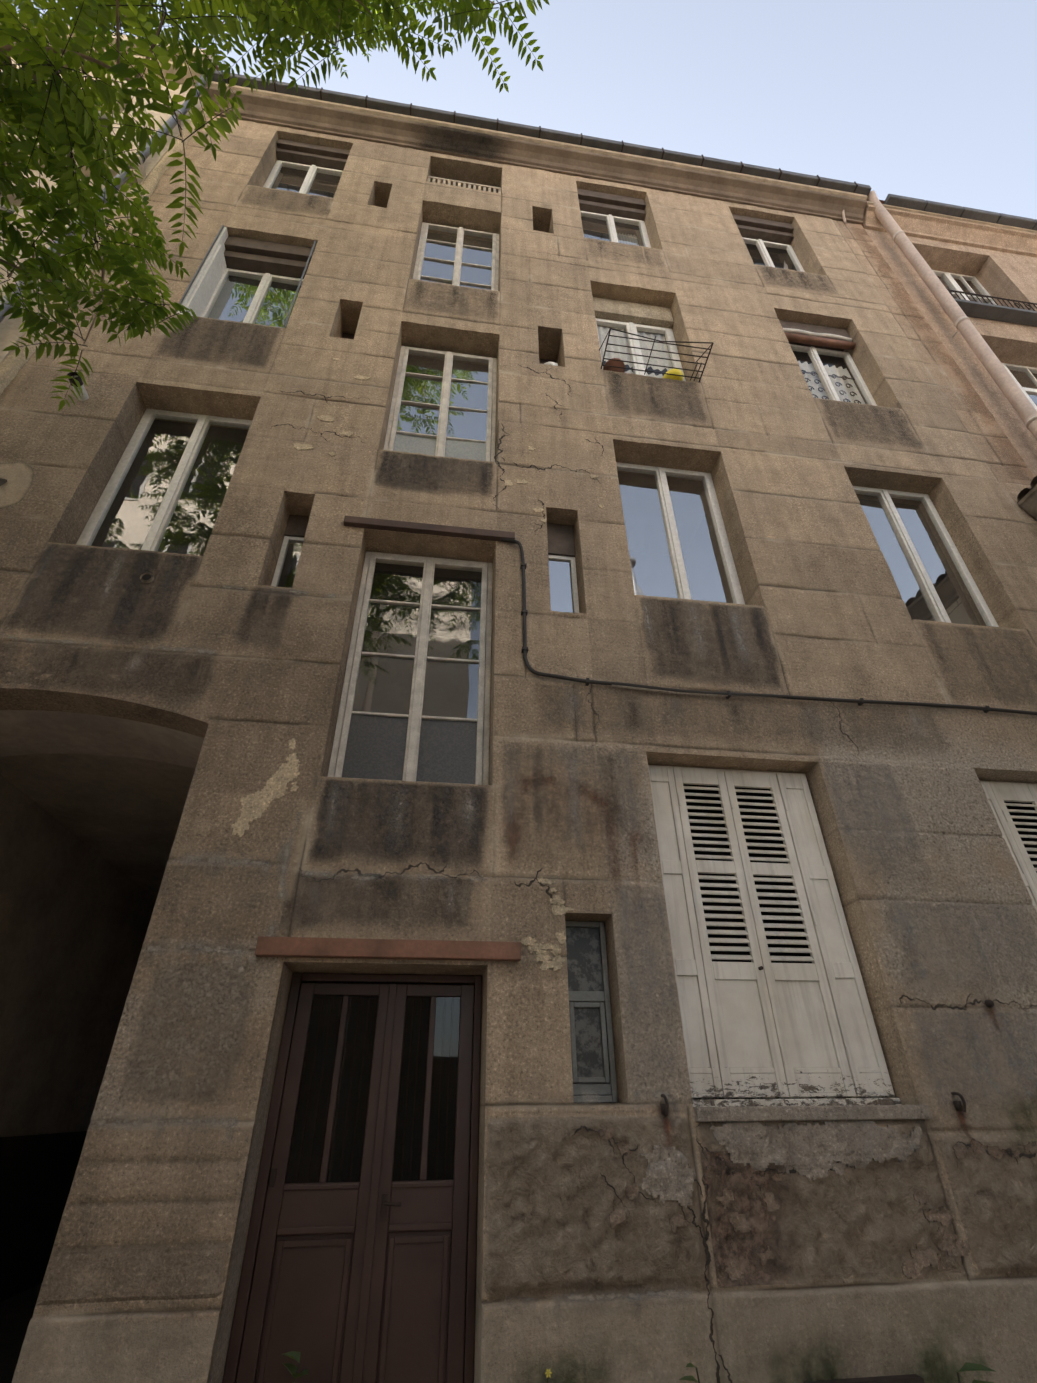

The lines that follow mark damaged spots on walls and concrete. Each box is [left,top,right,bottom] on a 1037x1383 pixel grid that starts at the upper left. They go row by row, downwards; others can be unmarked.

crack [493,364,604,535]
leakage [8,545,215,675]
leakage [644,599,778,684]
peeling [232,738,300,837]
leakage [295,780,485,922]
crack [299,862,481,883]
crack [514,868,552,898]
spalling [521,876,574,971]
crack [896,994,1034,1011]
peeling [598,1103,924,1287]
crack [572,1124,852,1383]